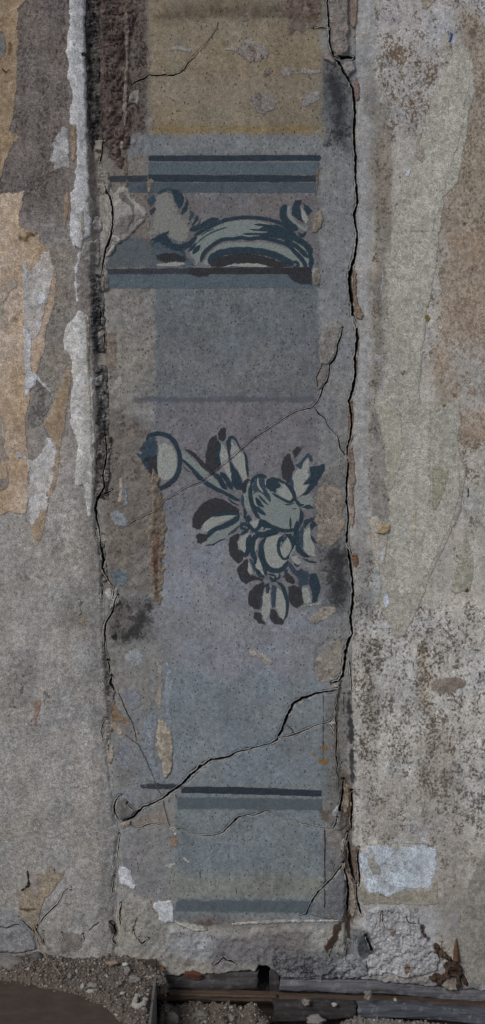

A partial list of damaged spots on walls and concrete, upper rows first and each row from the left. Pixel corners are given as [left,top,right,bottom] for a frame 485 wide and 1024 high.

damp [324,74,347,147]
peeling [0,0,140,546]
crack [0,0,386,972]
peeling [18,866,65,927]
peeling [368,852,381,875]
spalling [270,906,440,979]